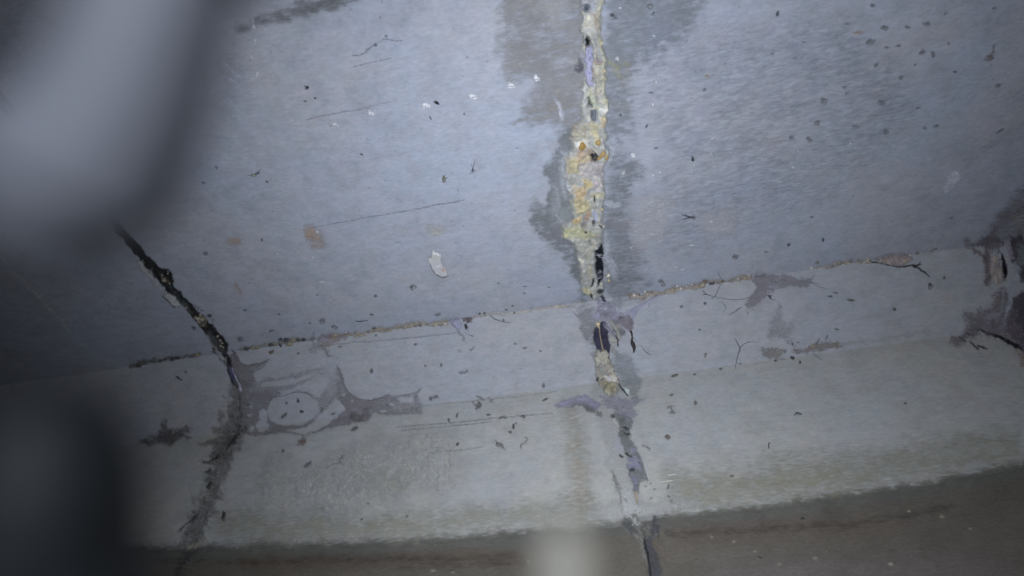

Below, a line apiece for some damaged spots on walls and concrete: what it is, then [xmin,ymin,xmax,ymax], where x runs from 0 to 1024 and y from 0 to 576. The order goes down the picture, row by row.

water stain [503,0,693,398]
crack [590,244,620,353]
crack [866,262,929,276]
water stain [990,256,1004,284]
crack [129,241,249,576]
crack [611,412,668,576]